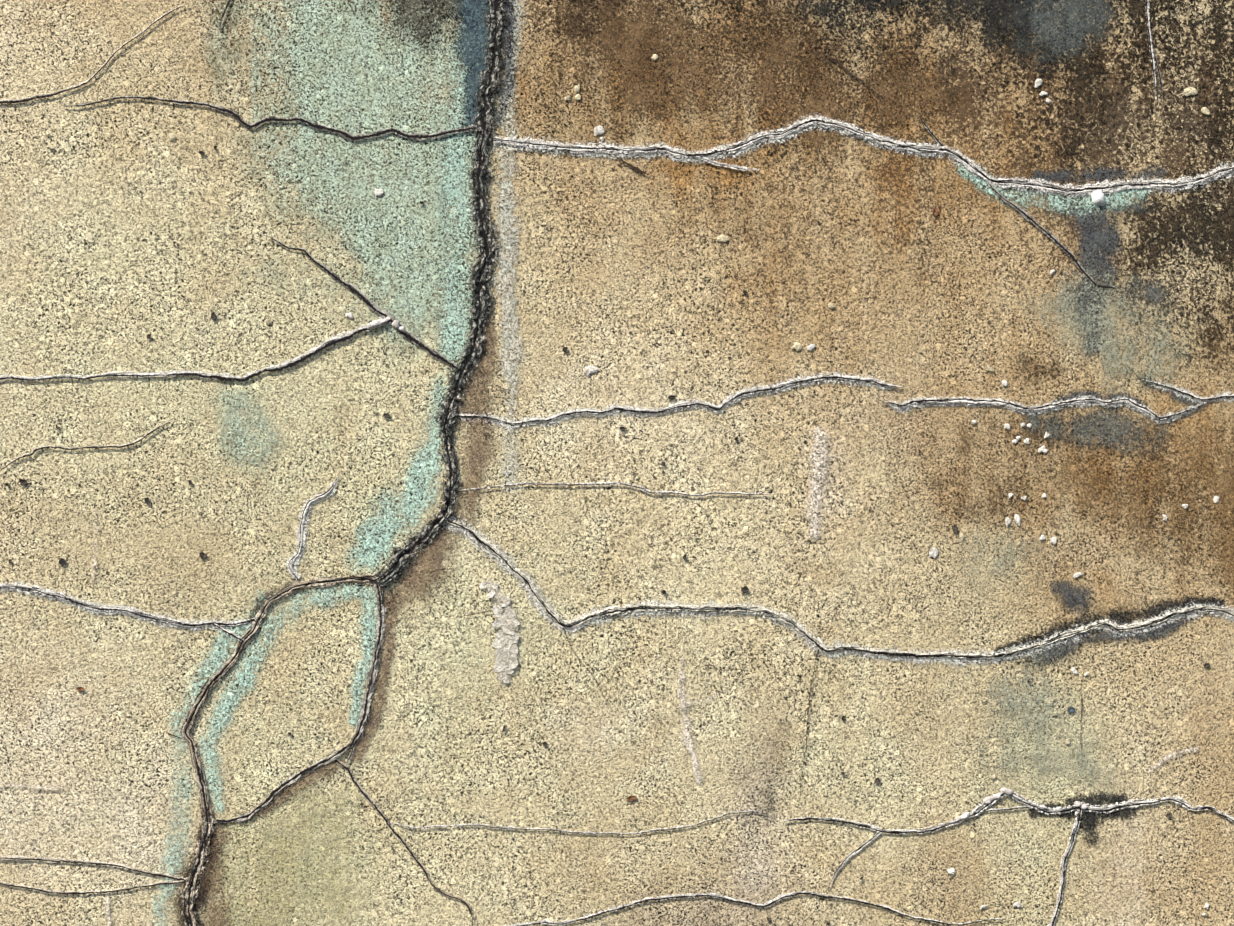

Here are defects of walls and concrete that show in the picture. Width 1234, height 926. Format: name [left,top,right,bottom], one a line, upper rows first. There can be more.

corrosion [495,0,991,174]
crack [493,113,1234,290]
leakage [572,0,1234,460]
leakage [153,0,527,926]
crack [0,0,900,926]
corrosion [1016,352,1067,387]
crack [881,379,1234,424]
corrosion [911,402,1234,608]
corrosion [1204,301,1234,395]
crack [446,515,1234,765]
leakage [989,578,1226,847]
crack [504,787,1234,926]